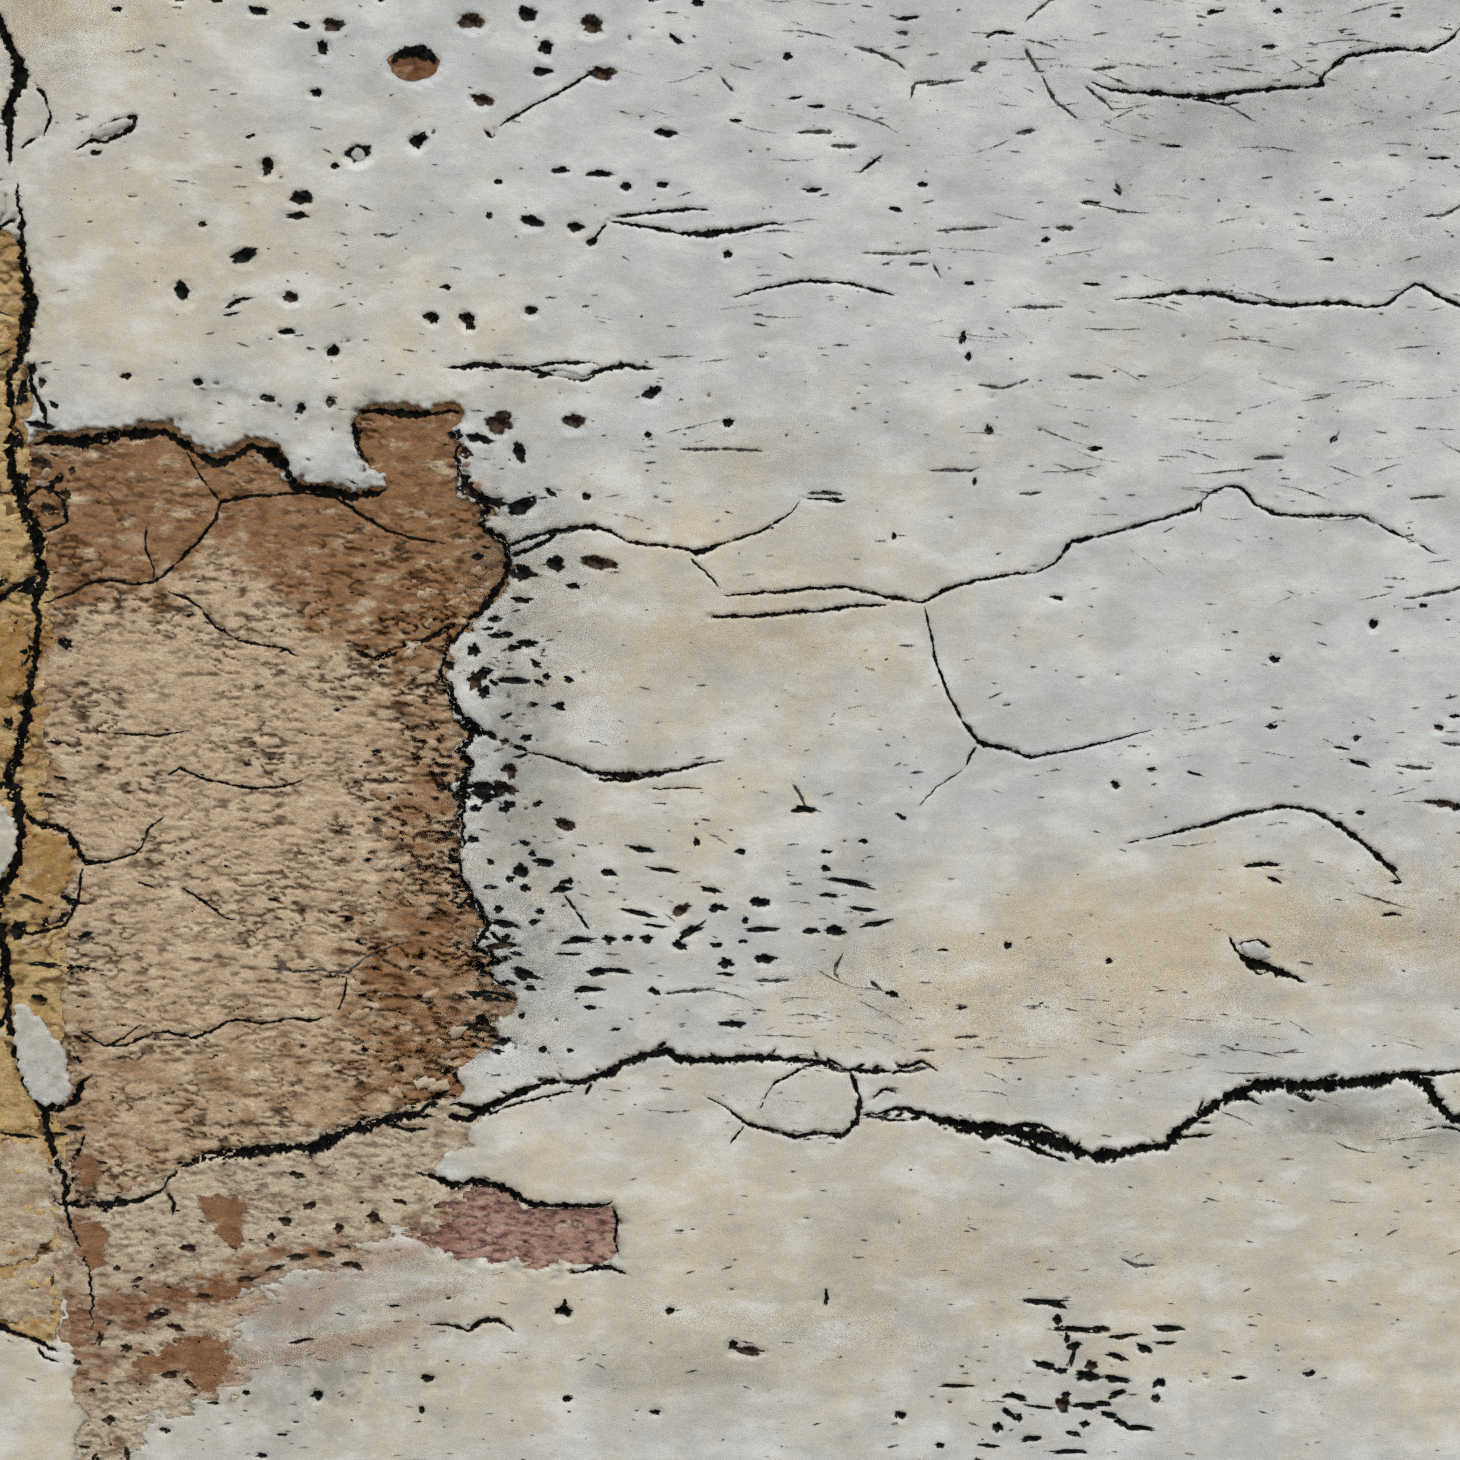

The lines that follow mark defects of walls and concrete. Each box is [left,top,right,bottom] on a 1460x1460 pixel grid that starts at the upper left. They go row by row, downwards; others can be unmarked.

crack [0,13,52,164]
crack [854,0,1460,135]
spalling [0,187,622,1460]
crack [0,179,1460,1332]